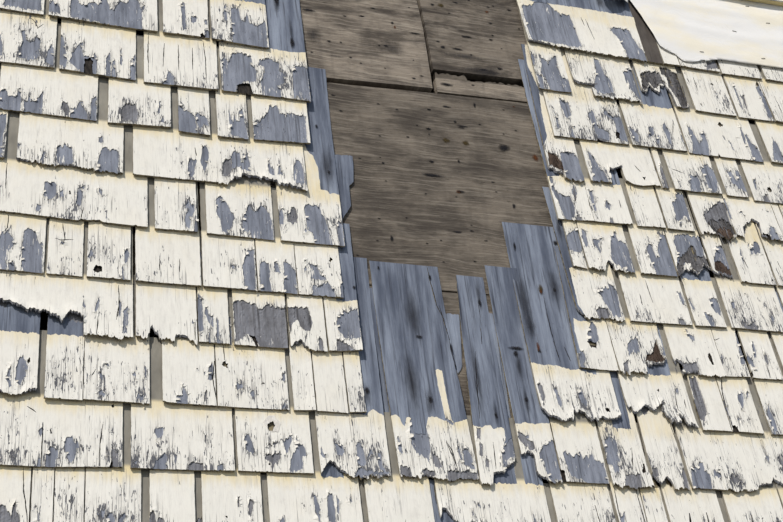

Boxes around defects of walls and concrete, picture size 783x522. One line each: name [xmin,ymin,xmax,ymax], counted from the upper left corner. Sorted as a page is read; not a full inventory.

peeling [3,0,146,36]
peeling [18,30,136,80]
peeling [222,5,311,143]
peeling [522,2,619,139]
peeling [0,228,44,273]
peeling [185,144,209,232]
peeling [215,196,284,240]
peeling [304,204,345,246]
peeling [548,150,635,273]
crack [427,268,456,369]
crack [474,305,482,417]
peeling [494,434,623,489]